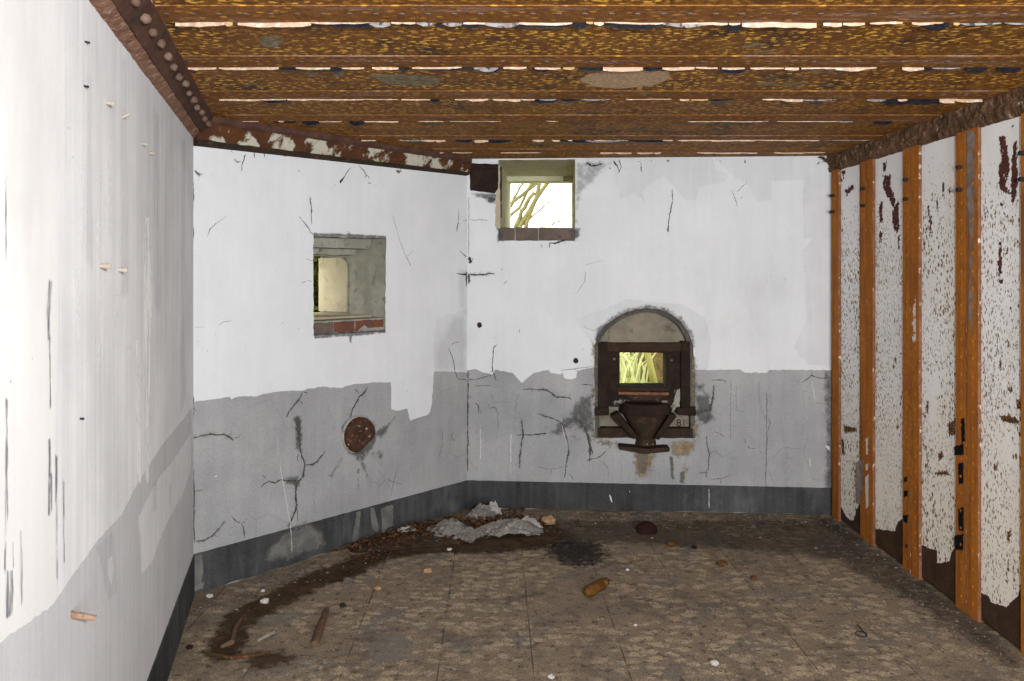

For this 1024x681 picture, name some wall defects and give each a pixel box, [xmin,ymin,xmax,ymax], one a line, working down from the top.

peeling [579,70,671,89]
crack [193,395,247,542]
crack [261,392,325,528]
crack [440,342,609,479]
peeling [1000,399,1021,426]